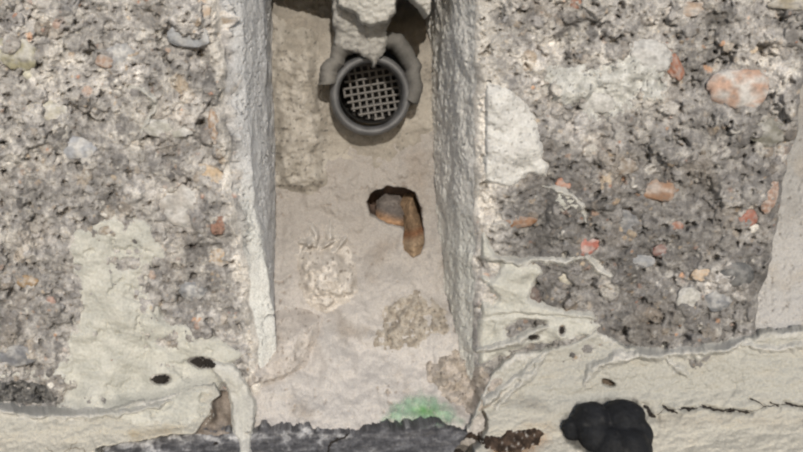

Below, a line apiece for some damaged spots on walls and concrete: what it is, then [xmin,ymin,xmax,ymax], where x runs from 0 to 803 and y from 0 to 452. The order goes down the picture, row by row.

crack [643,398,803,418]
corrosion [478,428,544,452]